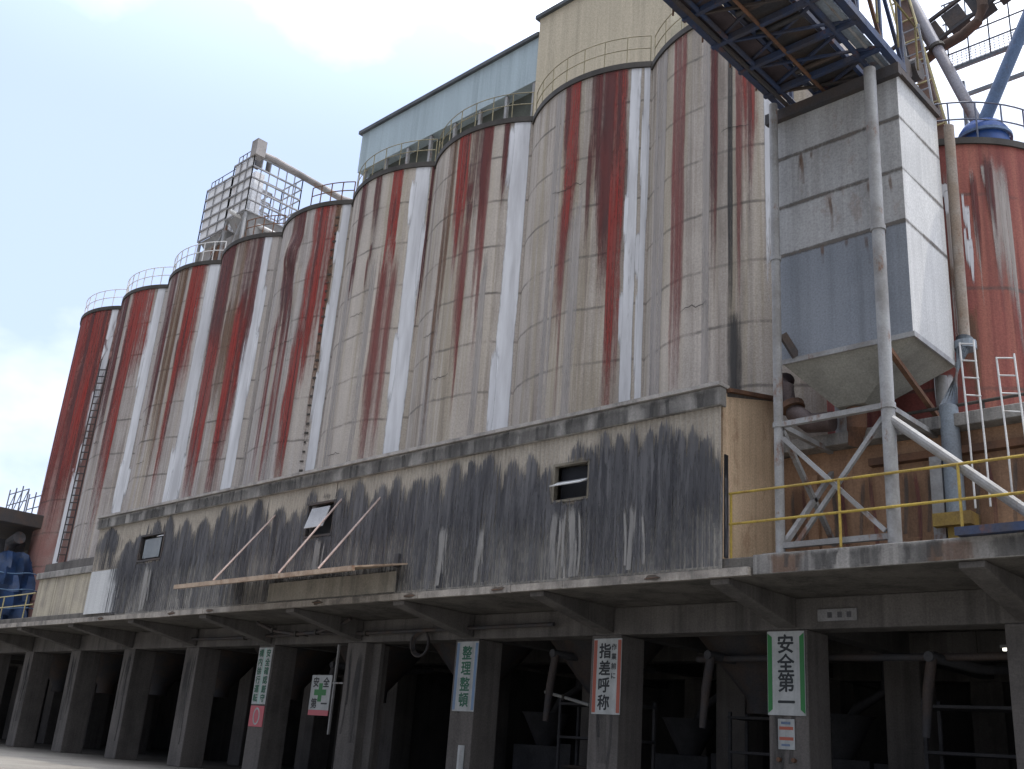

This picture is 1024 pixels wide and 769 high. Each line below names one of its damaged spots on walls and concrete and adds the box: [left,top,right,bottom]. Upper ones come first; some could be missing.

rust [38,265,206,515]
rust [182,237,265,493]
rust [257,205,341,474]
rust [348,169,404,436]
water stain [80,397,729,615]
rust [426,123,510,384]
rust [557,69,628,401]
rust [710,49,718,234]
rust [736,75,755,248]
peeling [961,194,974,280]